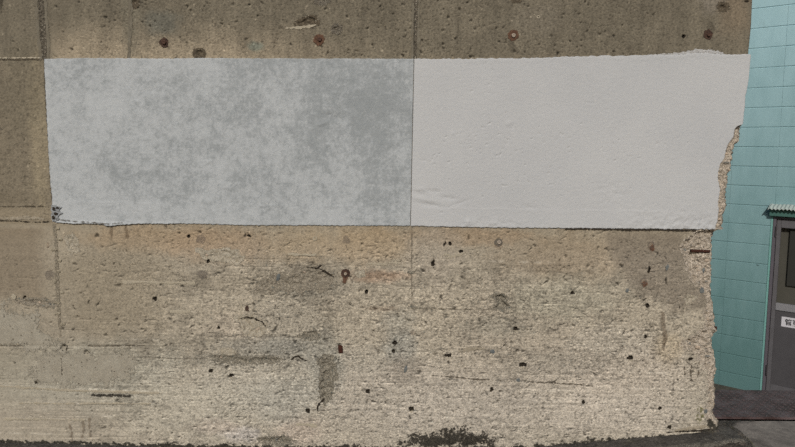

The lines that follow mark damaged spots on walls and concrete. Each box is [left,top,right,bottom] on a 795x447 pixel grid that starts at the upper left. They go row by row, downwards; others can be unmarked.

spalling [678,125,740,424]
leakage [0,439,273,447]
leakage [285,425,502,447]
leakage [511,434,664,447]